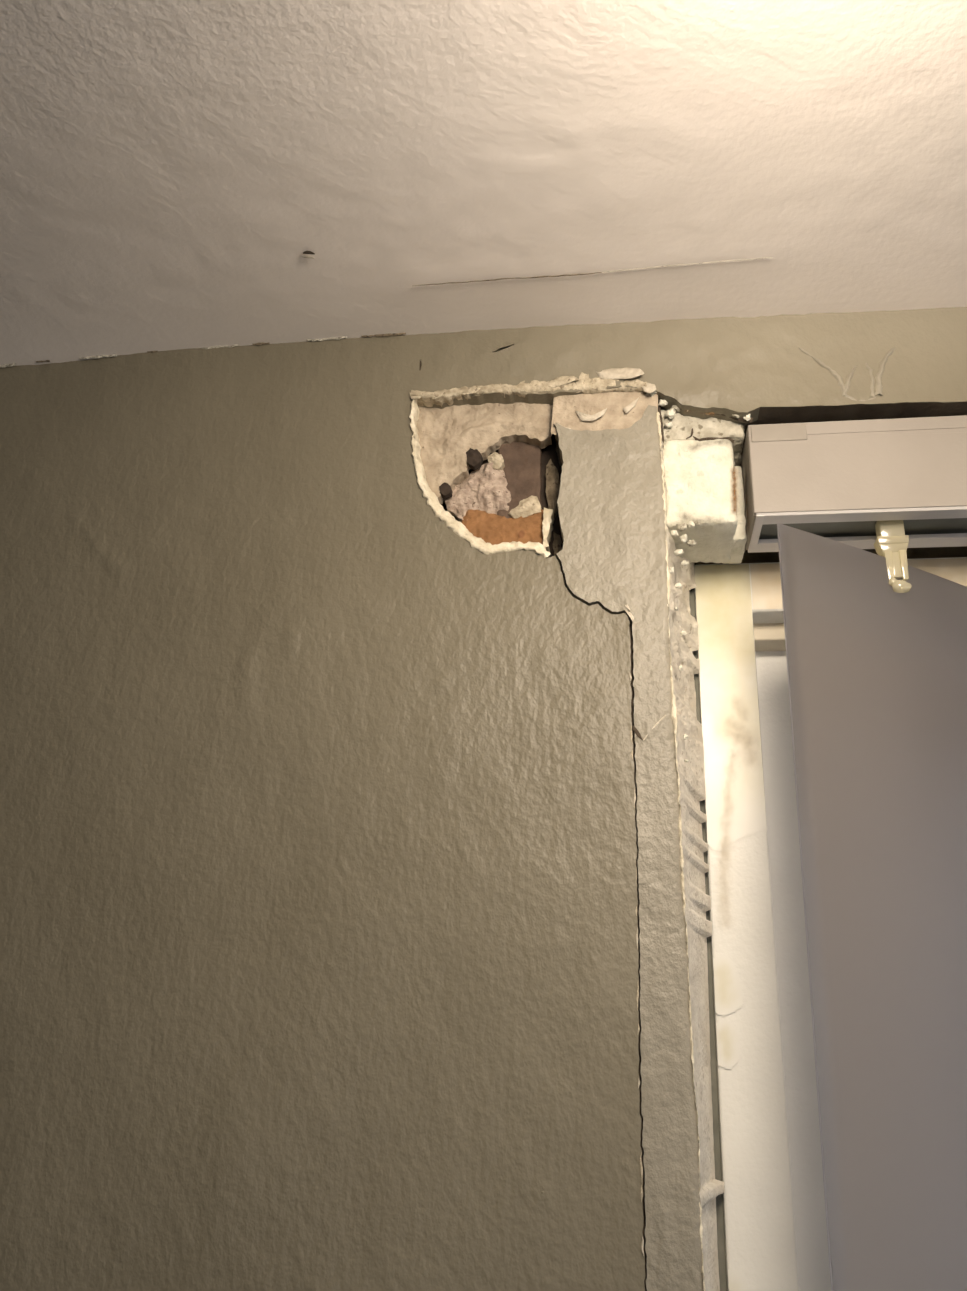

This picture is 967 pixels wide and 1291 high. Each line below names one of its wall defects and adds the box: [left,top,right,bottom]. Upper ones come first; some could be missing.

flaking render [409,367,706,1291]
crack [556,557,666,1291]